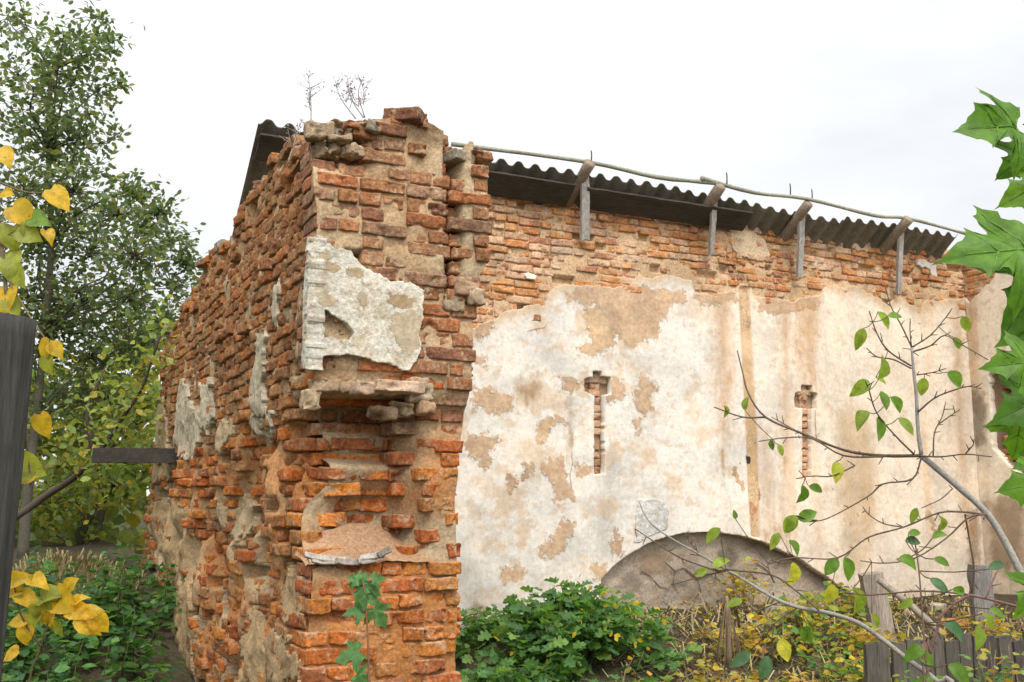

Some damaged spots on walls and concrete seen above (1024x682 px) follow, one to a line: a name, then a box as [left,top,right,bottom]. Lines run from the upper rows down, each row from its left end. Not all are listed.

spalling [319,248,364,277]
spalling [357,291,369,309]
spalling [387,292,422,356]
peeling [475,321,496,339]
peeling [464,429,501,472]